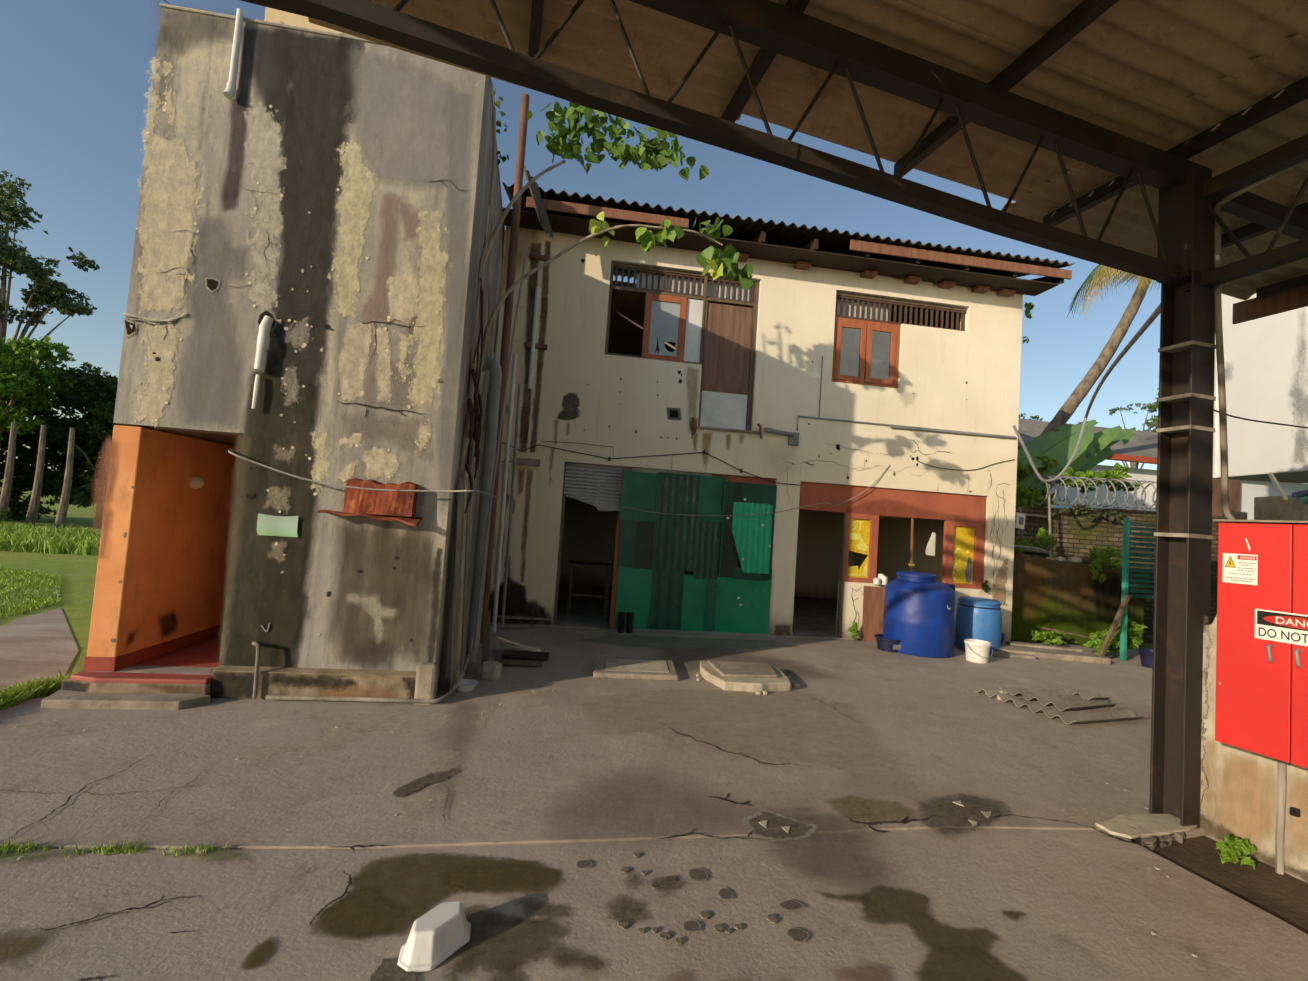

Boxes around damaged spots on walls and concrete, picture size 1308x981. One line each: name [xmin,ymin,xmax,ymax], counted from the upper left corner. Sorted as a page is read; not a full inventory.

peeling [123,57,206,426]
peeling [243,97,324,353]
damp [164,12,467,495]
peeling [327,140,451,454]
rust [363,194,421,333]
damp [153,436,355,699]
peeling [273,431,400,497]
damp [322,452,442,668]
crack [0,756,215,842]
damp [403,678,416,699]
crack [665,725,810,767]
crack [33,894,201,932]